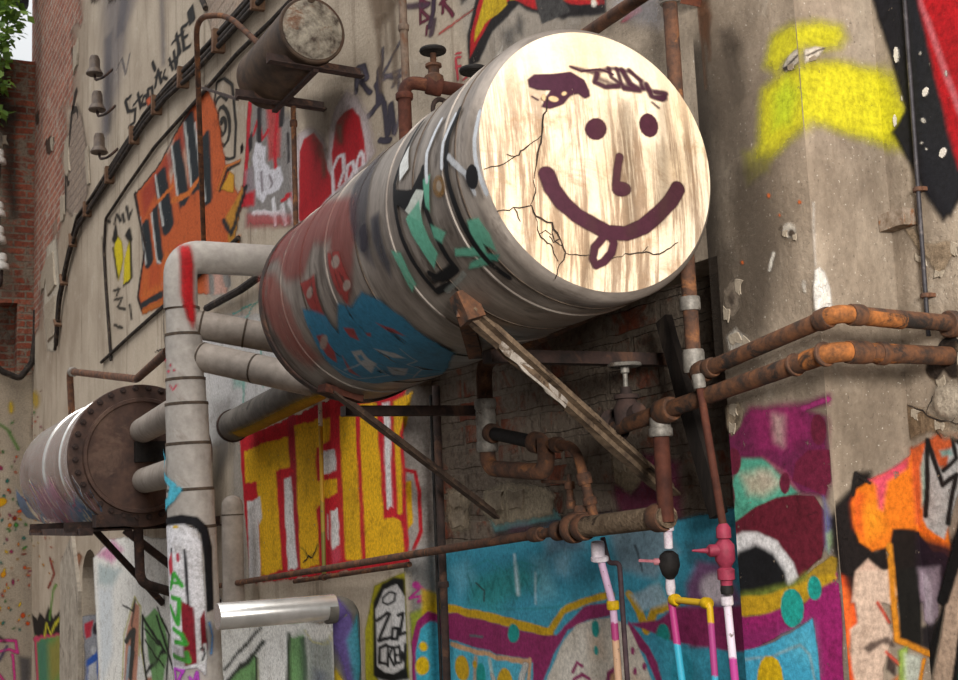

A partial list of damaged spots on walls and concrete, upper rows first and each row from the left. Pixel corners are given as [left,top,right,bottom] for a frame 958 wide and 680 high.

spalling [905,228,958,278]
peeling [499,342,568,408]
peeling [445,483,469,532]
peeling [483,482,555,525]